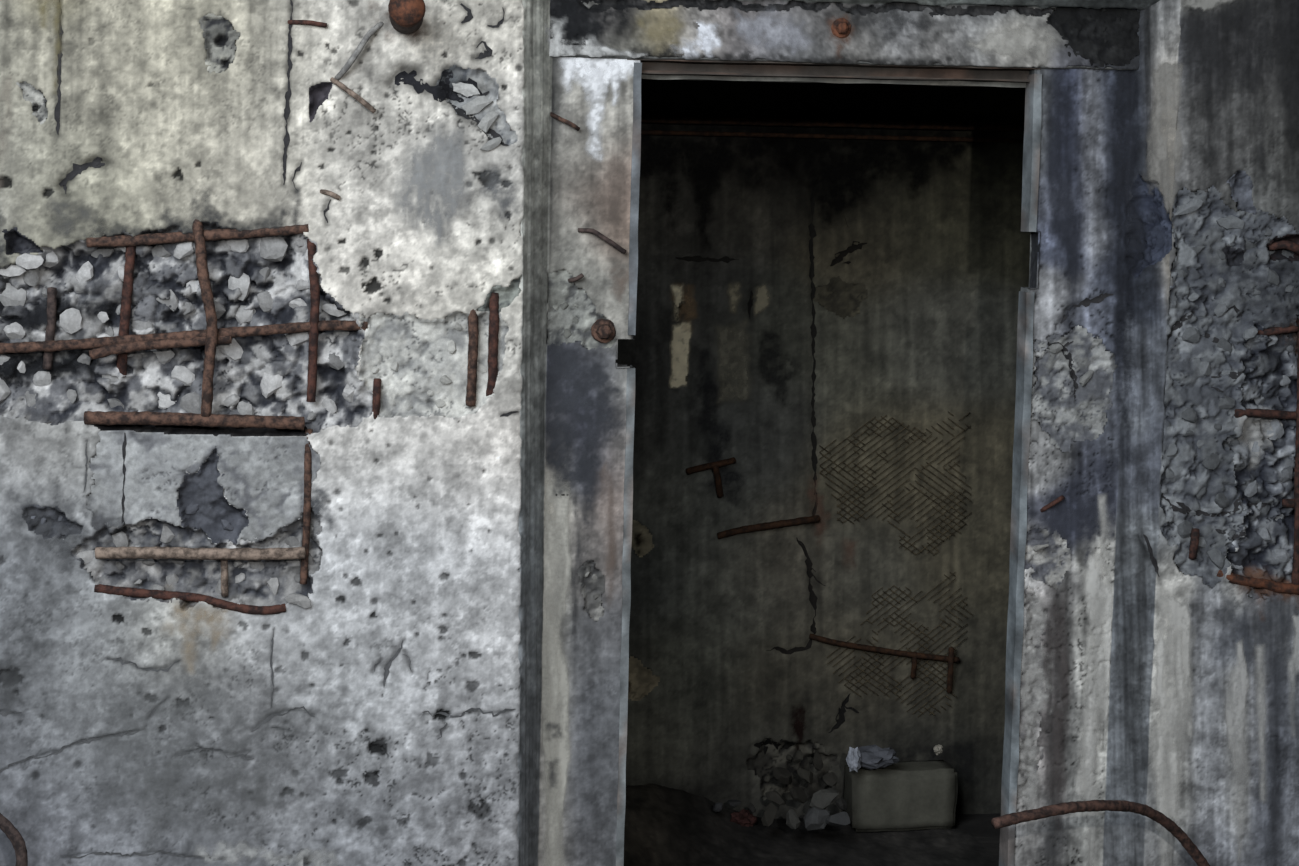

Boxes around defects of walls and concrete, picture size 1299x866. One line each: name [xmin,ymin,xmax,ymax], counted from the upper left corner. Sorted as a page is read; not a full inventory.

water stain [1148,63,1182,211]
spalling [0,219,522,615]
crack [766,186,867,654]
water stain [1114,269,1135,388]
spalling [1126,170,1299,599]
water stain [1237,408,1283,465]
crack [829,694,859,733]
water stain [1017,595,1052,807]
water stain [1075,488,1116,857]
water stain [1151,597,1192,866]
water stain [1225,616,1299,800]